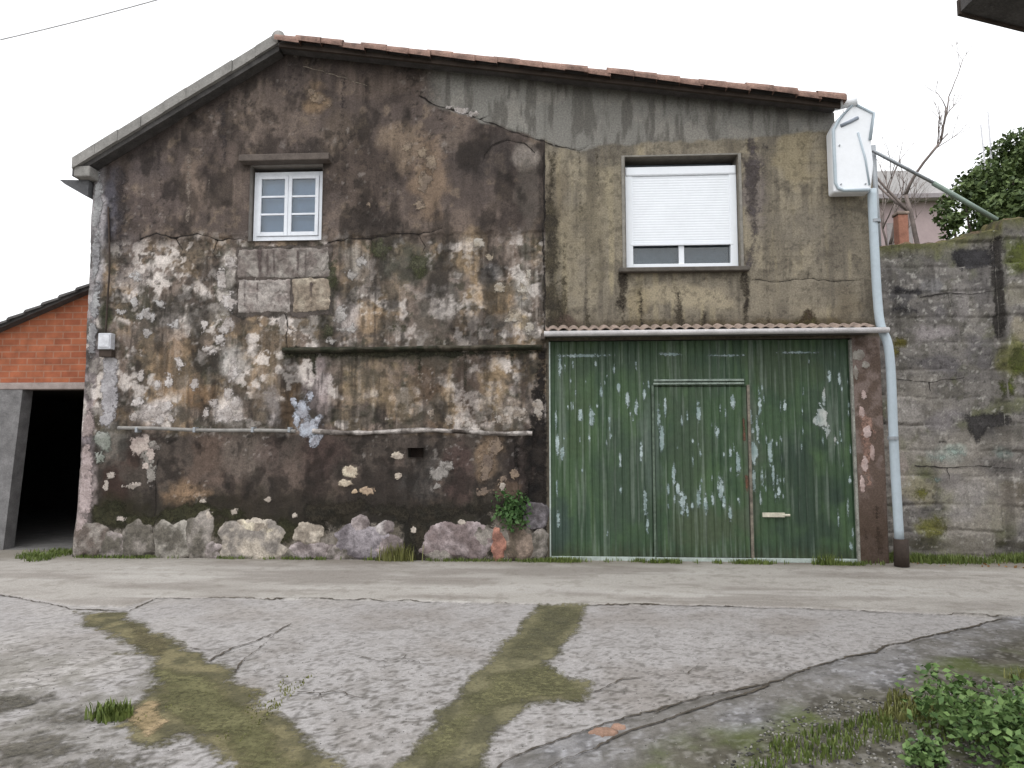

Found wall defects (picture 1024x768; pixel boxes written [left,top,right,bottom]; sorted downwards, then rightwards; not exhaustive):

crack [419,95,582,330]
damp [740,139,819,336]
damp [952,235,1006,338]
spalling [73,172,560,561]
peeling [494,354,650,460]
peeling [656,398,667,450]
peeling [667,385,784,519]
peeling [801,349,875,493]
damp [964,412,1012,443]